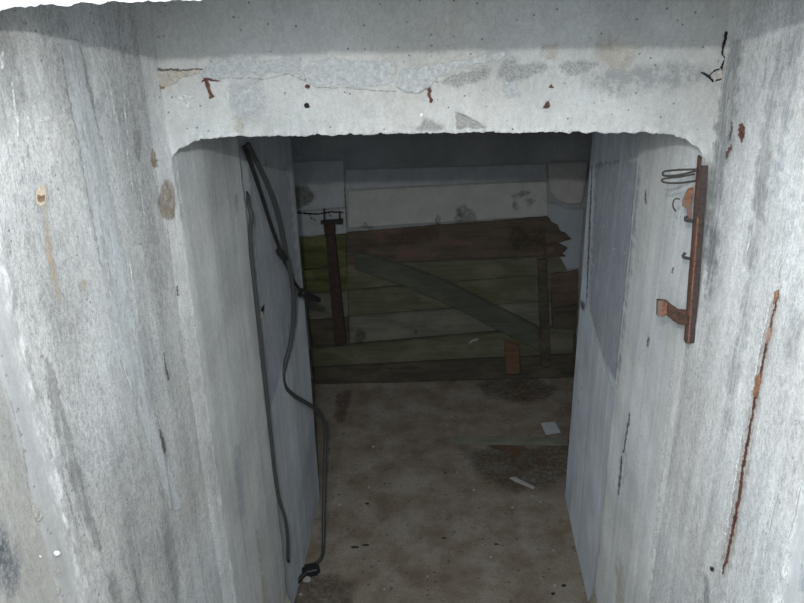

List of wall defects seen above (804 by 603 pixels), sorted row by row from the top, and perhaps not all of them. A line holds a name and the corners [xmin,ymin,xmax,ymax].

crack [701,31,728,82]
rust [202,78,220,99]
rust [656,155,708,344]